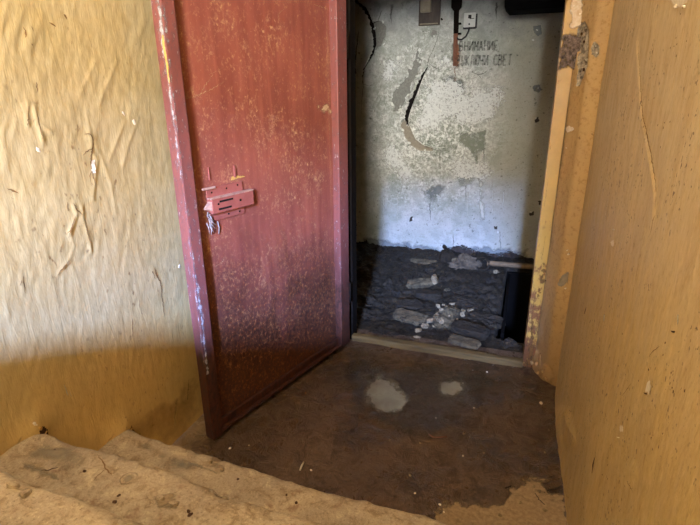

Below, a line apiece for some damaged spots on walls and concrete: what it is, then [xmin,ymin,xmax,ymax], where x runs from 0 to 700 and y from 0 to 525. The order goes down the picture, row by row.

peeling [391,48,444,151]
crack [405,41,438,125]
flaking render [570,0,600,86]